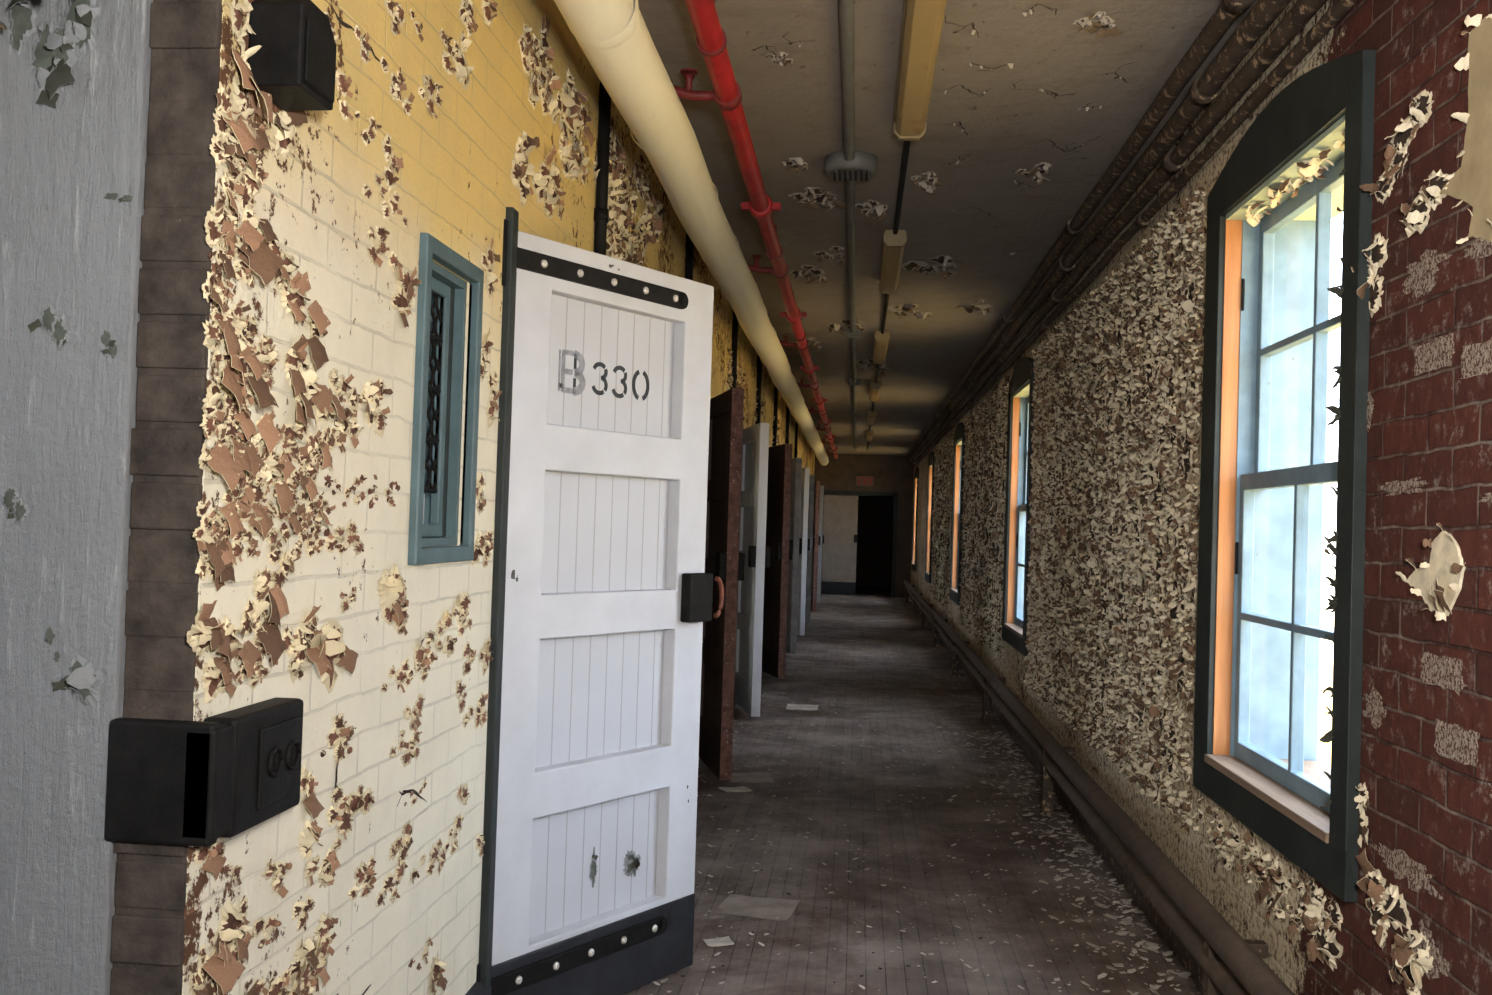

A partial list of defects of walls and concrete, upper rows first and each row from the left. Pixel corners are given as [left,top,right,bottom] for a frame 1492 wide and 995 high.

peeling [0,0,100,108]
peeling [335,69,421,328]
peeling [511,16,666,271]
peeling [1245,129,1346,227]
peeling [1327,233,1389,318]
peeling [1359,14,1492,244]
peeling [377,564,493,767]
peeling [929,376,1011,662]
peeling [1023,181,1343,971]
peeling [1396,523,1466,621]
peeling [189,713,485,995]
peeling [1354,782,1434,995]